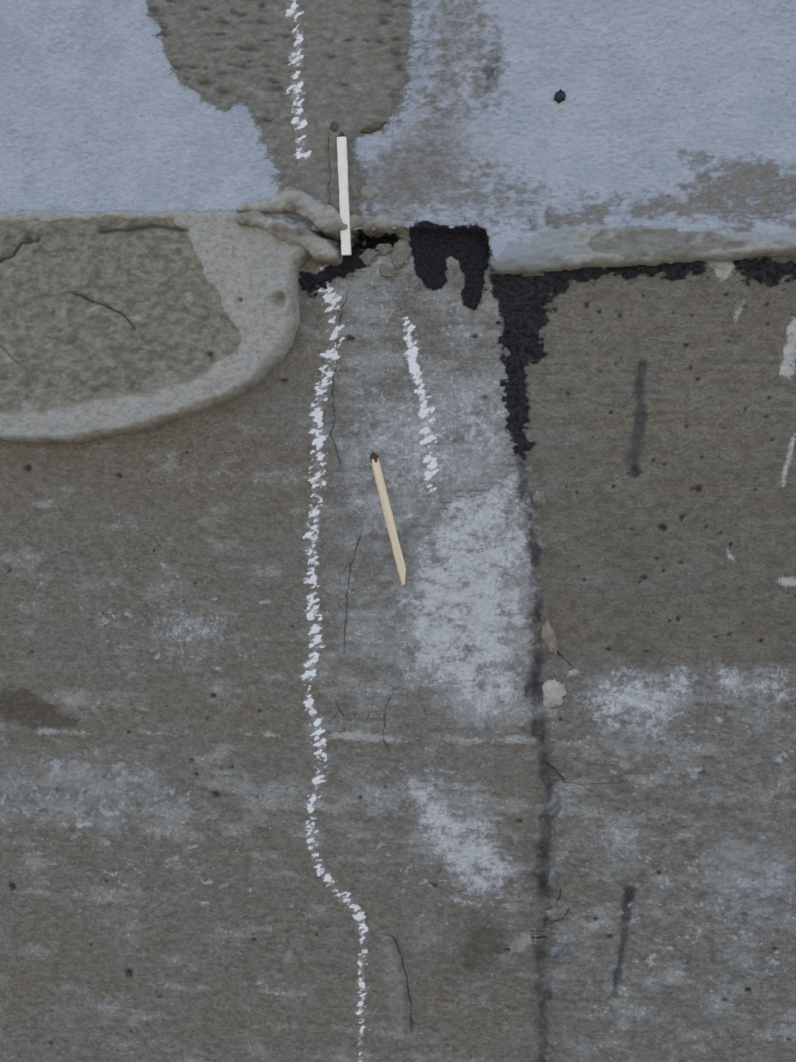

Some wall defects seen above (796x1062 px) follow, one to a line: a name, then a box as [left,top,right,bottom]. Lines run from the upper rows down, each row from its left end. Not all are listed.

peeling [145,0,417,216]
peeling [284,213,317,232]
water stain [342,379,544,729]
water stain [584,665,793,751]
water stain [398,773,523,896]
water stain [614,888,634,987]
water stain [718,846,796,965]